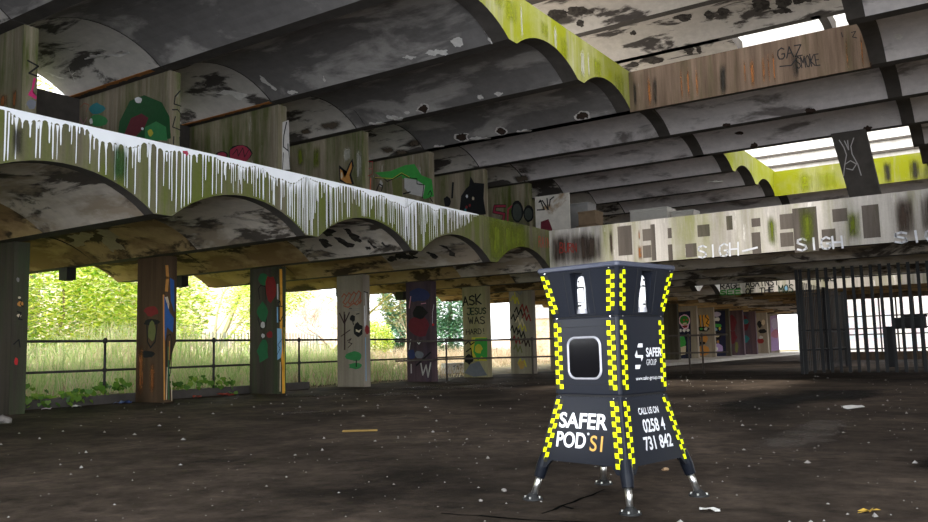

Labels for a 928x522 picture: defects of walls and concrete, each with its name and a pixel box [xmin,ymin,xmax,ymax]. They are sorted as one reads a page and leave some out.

damp [115,148,125,176]